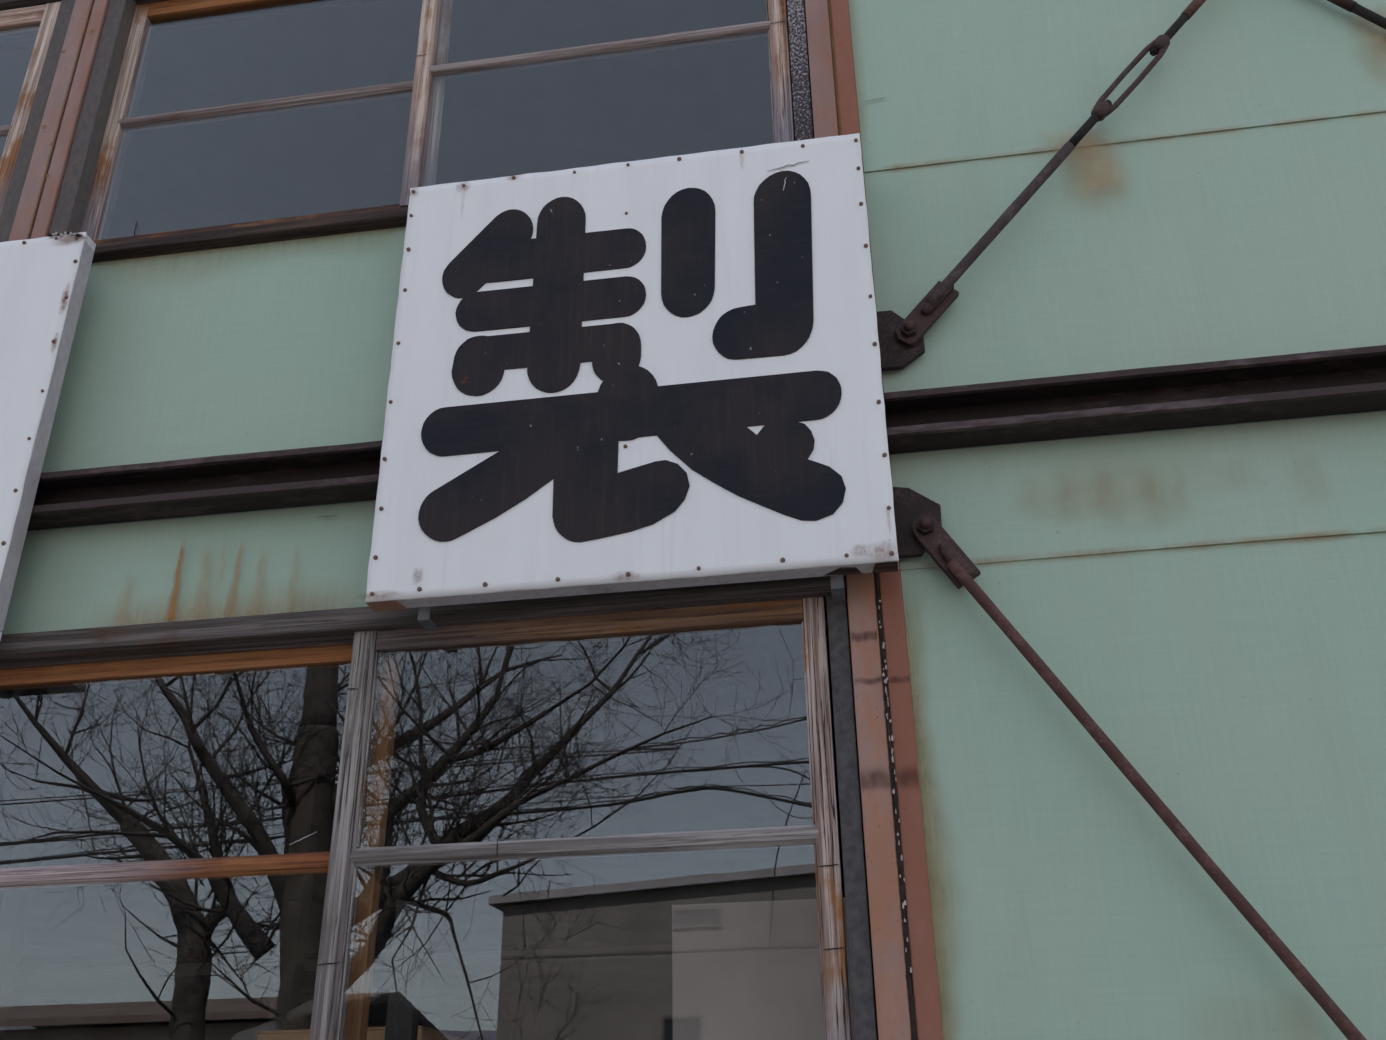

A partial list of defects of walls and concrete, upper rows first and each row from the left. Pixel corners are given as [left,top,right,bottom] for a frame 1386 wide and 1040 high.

rust [167,547,184,620]